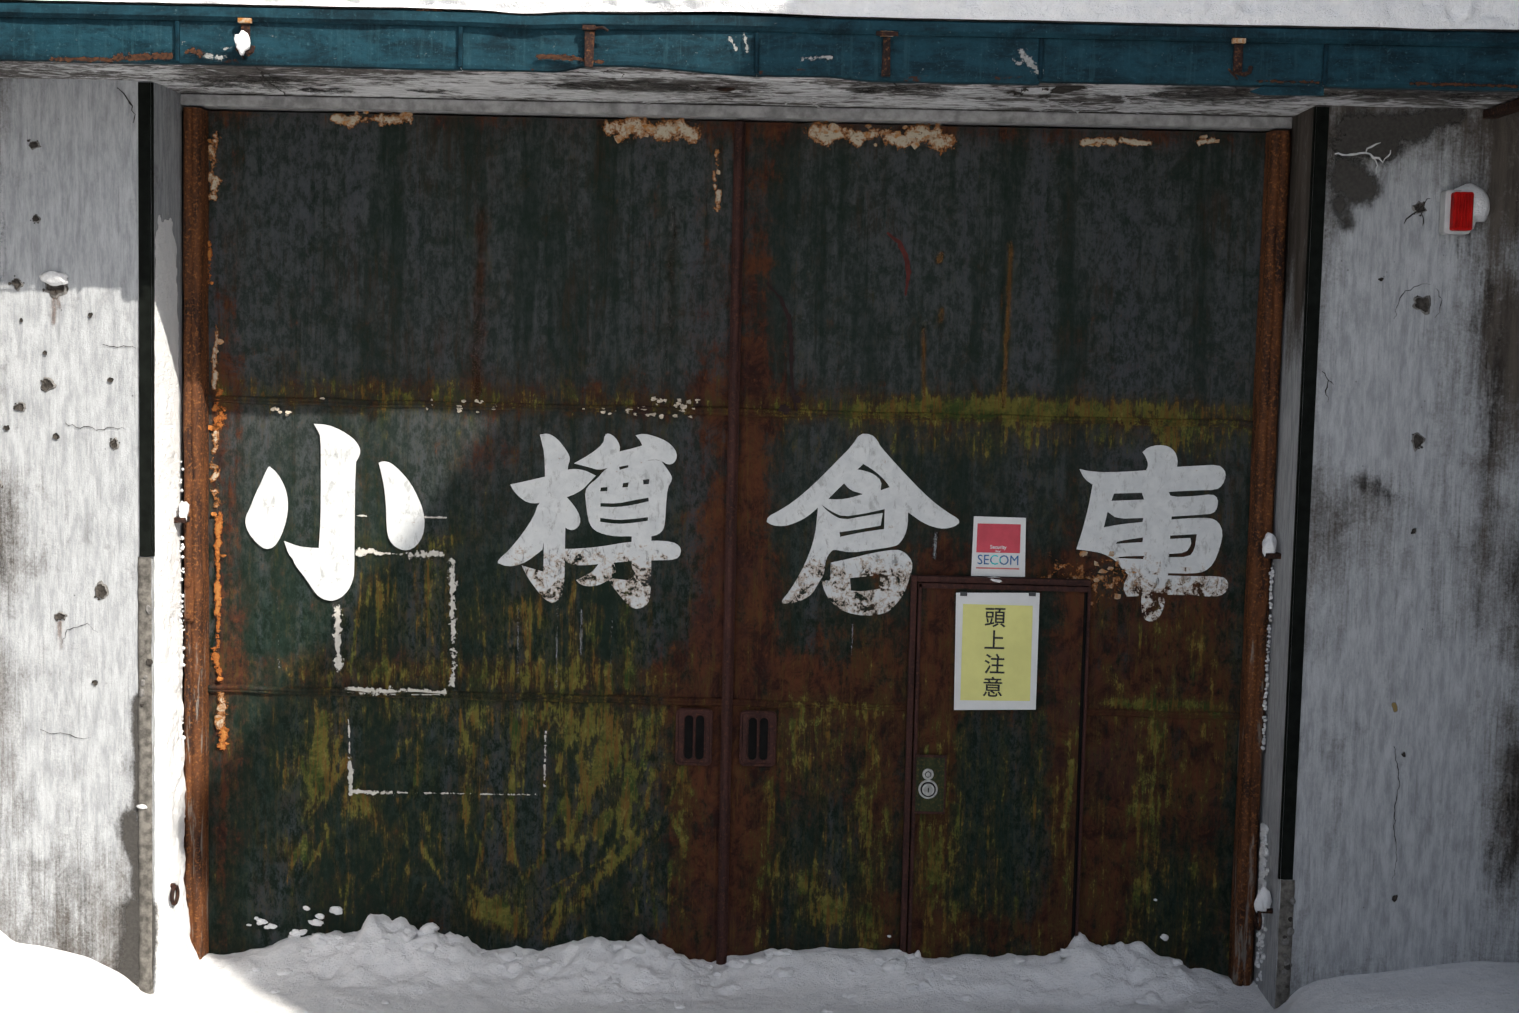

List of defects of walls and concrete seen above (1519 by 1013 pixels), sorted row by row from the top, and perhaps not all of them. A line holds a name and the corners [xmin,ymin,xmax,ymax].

peeling [601,117,722,212]
peeling [804,121,957,156]
leakage [114,694,159,985]
crack [1392,747,1400,878]
leakage [1489,744,1519,882]